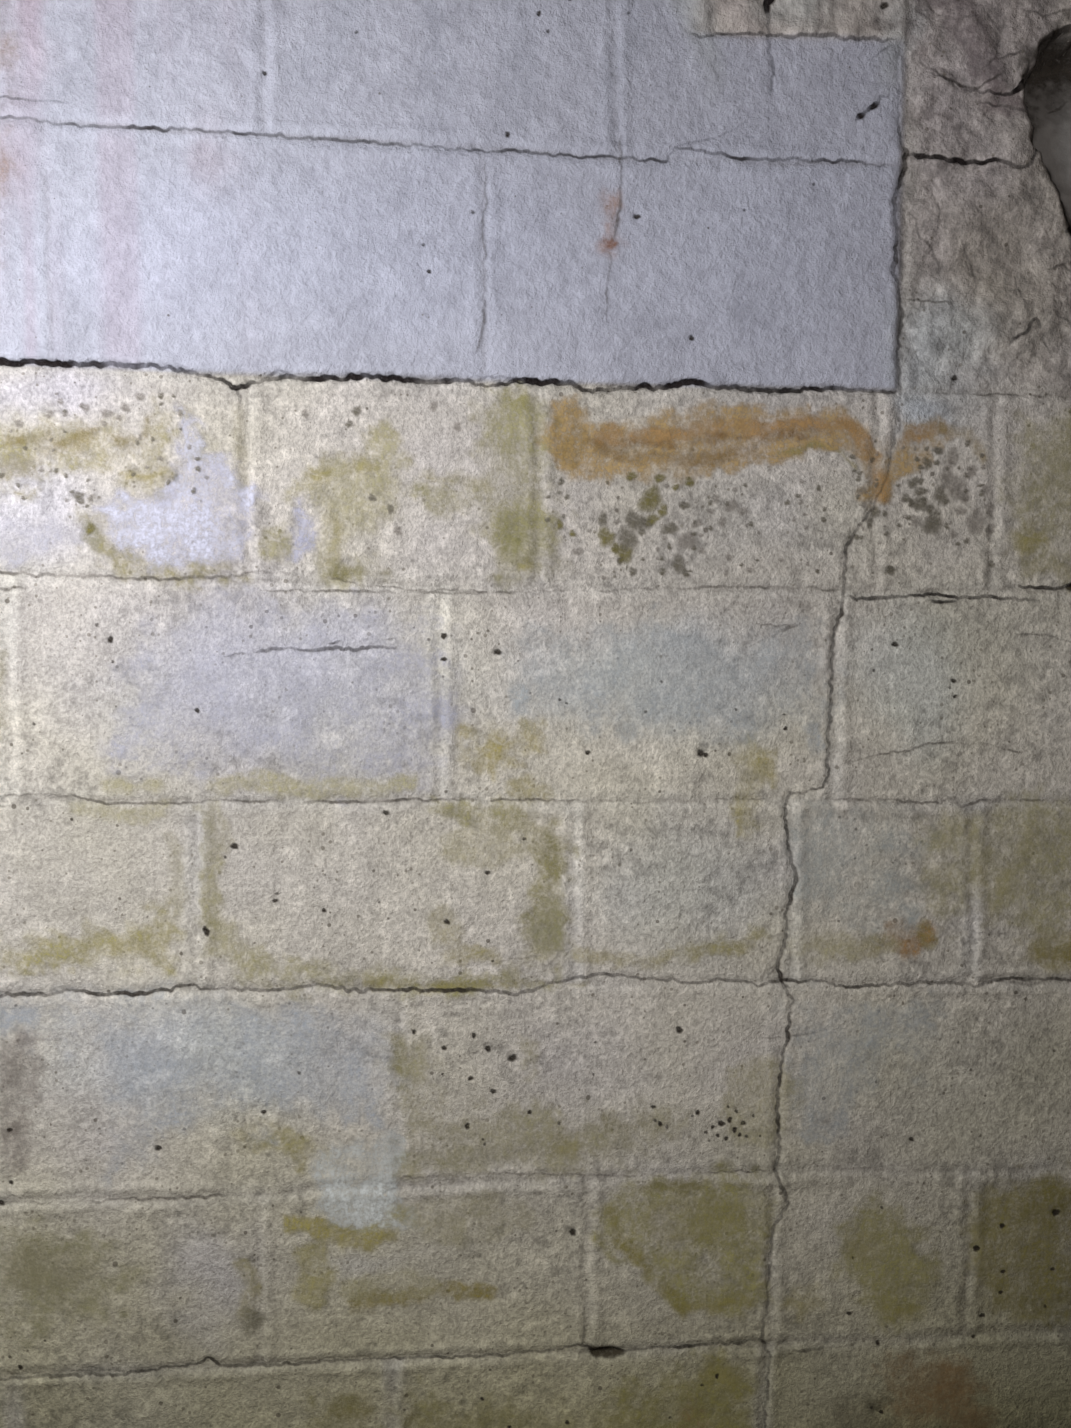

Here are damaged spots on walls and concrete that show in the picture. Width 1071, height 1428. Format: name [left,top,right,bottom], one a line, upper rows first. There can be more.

spalling [1020,24,1071,235]
crack [856,102,1037,394]
crack [0,357,837,393]
rust [541,399,944,502]
crack [760,515,886,1197]
crack [995,974,1071,982]
crack [80,984,208,997]
crack [343,986,533,994]
crack [566,1342,620,1350]
crack [672,1341,742,1349]
crack [111,1356,220,1376]